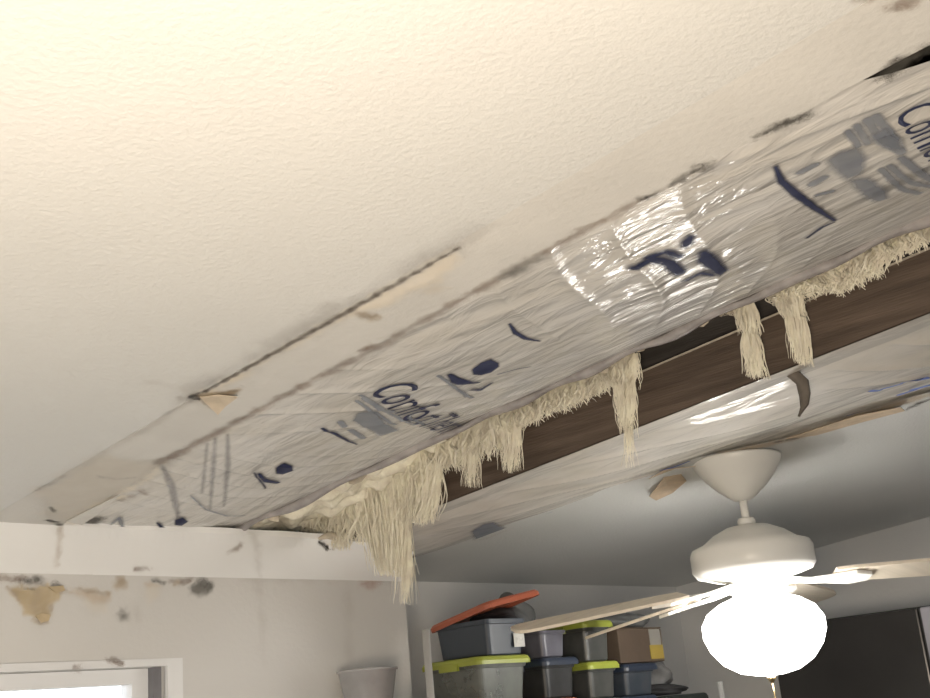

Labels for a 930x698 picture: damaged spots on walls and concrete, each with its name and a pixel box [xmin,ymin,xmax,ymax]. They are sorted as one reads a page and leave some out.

water stain [866,43,930,84]
water stain [751,109,820,141]
water stain [636,159,717,203]
peeling [649,474,686,500]
peeling [5,575,129,626]
water stain [167,577,214,598]